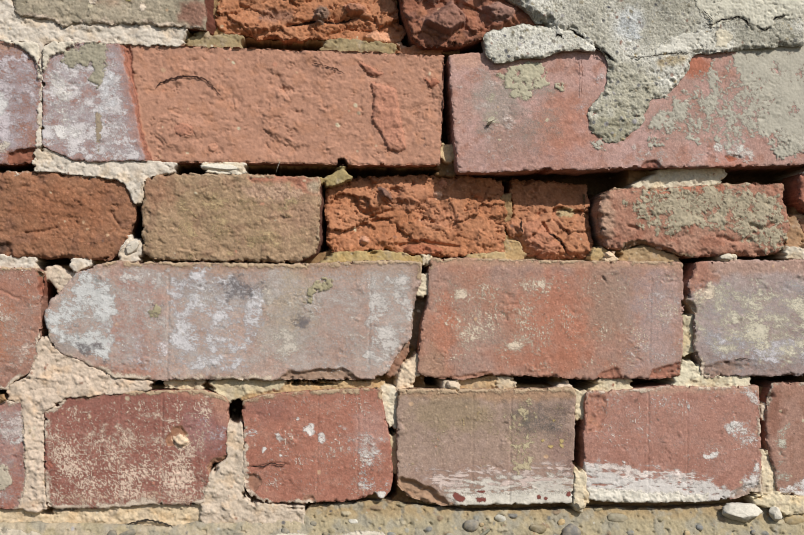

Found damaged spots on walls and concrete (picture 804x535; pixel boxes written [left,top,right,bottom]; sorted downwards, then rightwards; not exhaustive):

crack [703,9,786,31]
water stain [0,44,144,161]
spalling [124,0,804,165]
spalling [326,175,593,260]
spalling [623,240,658,249]
water stain [0,297,35,368]
water stain [30,264,413,376]
water stain [0,411,24,444]
water stain [0,459,12,503]